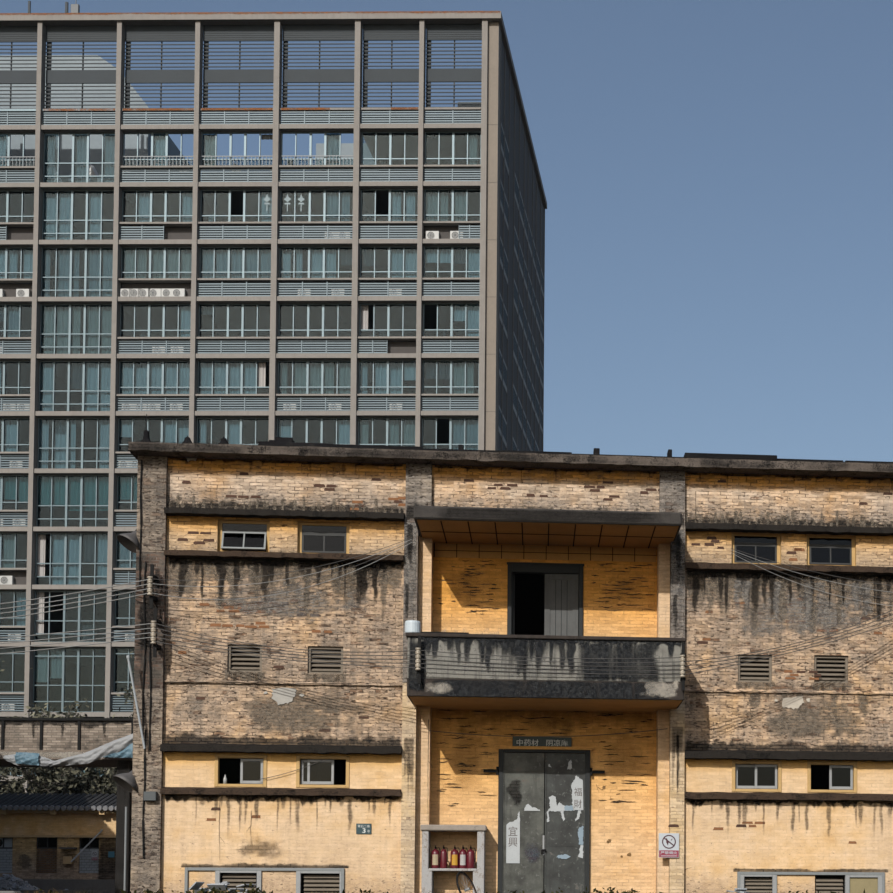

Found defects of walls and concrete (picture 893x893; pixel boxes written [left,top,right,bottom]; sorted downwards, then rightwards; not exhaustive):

damp [443,505,651,522]
damp [169,497,419,614]
damp [672,511,893,627]
damp [138,570,159,647]
damp [425,638,492,668]
damp [512,640,576,673]
spalling [263,687,304,705]
spalling [774,696,810,710]
damp [672,729,893,788]
damp [165,794,399,822]
damp [687,799,893,830]